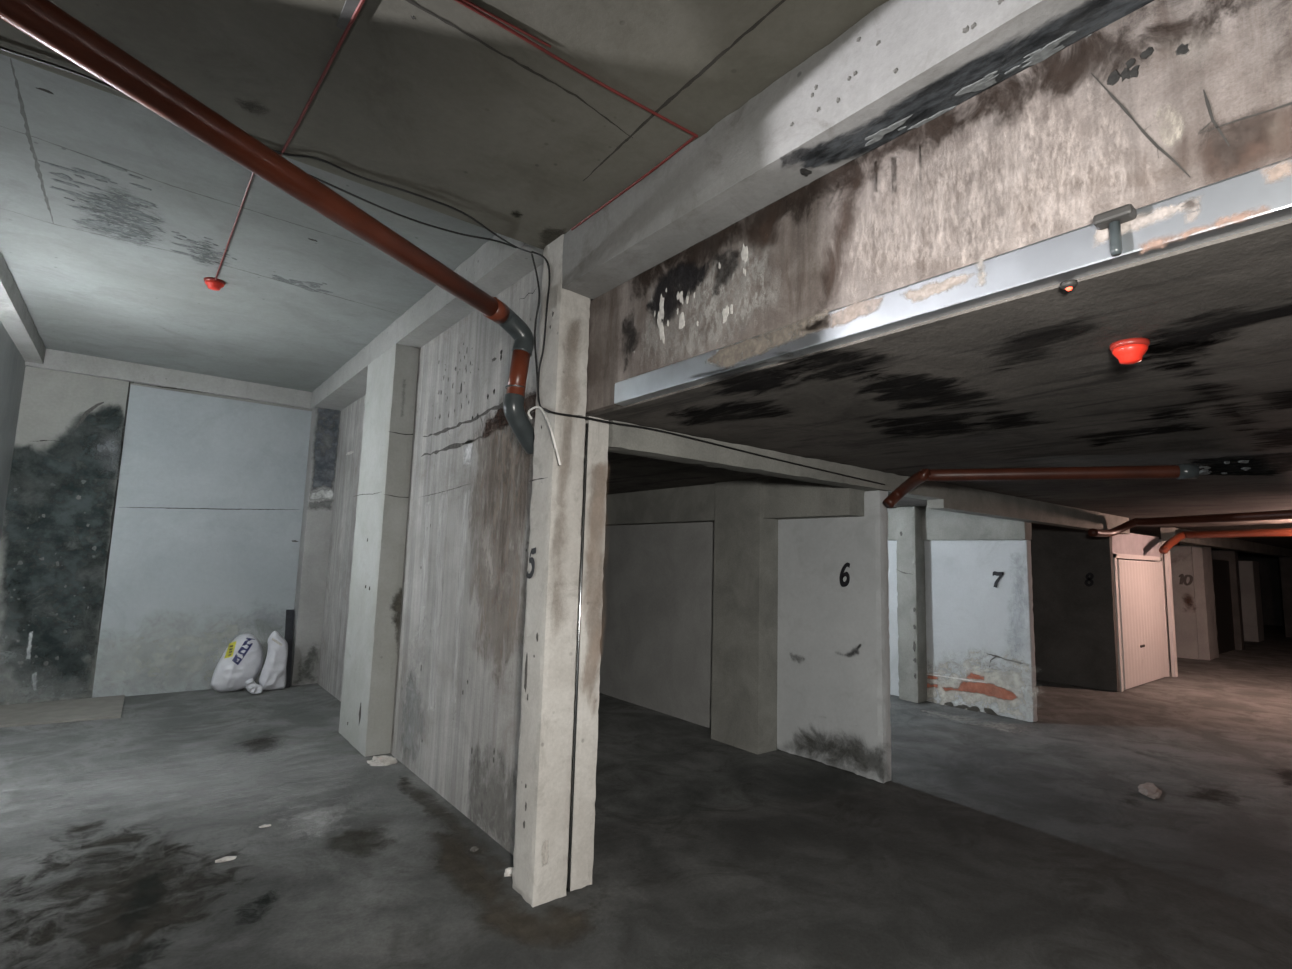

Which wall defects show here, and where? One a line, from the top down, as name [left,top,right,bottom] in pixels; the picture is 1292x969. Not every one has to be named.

damp [632,0,1240,325]
crack [1091,73,1190,177]
crack [1198,90,1292,146]
damp [622,320,636,365]
flaking render [654,288,699,343]
flaking render [722,304,733,323]
crack [393,392,536,457]
damp [668,349,1050,438]
damp [1075,304,1292,476]
crack [357,484,468,498]
damp [0,402,125,704]
flaking render [913,608,1029,716]